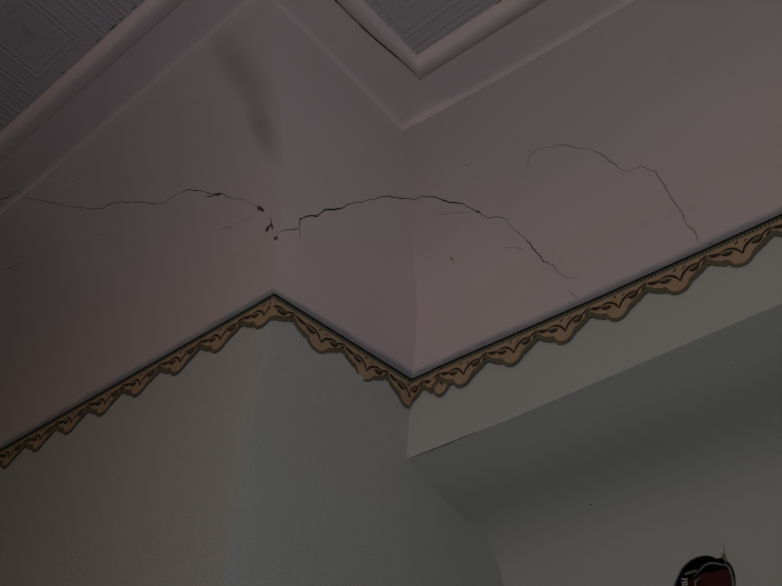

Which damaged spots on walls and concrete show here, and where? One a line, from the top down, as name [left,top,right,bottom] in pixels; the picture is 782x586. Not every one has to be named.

crack [334,0,414,73]
crack [0,189,264,229]
crack [273,196,578,298]
crack [522,144,719,245]